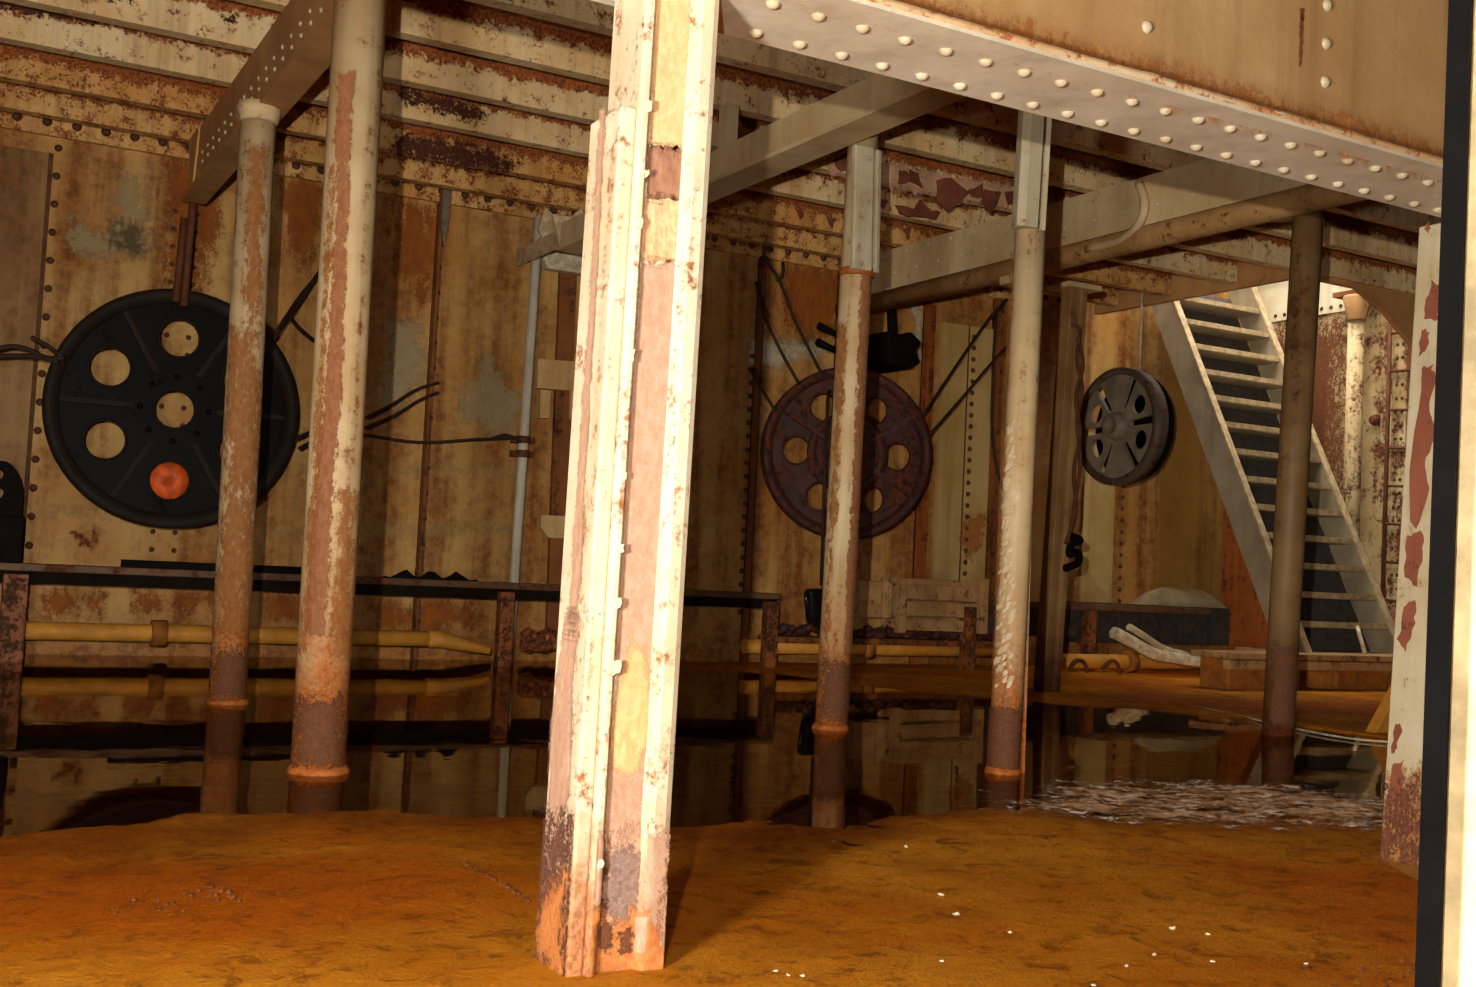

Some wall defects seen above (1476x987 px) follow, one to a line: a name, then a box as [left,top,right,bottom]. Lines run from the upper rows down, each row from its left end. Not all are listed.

rust [0,1,100,26]
rust [389,86,524,175]
peeling [828,152,847,178]
peeling [881,161,1014,239]
rust [971,14,1442,157]
rust [129,70,359,701]
rust [589,0,691,978]
rust [781,263,872,726]
rust [1312,313,1348,495]
peeling [1397,280,1439,652]
peeling [1385,724,1405,811]
rust [1380,761,1422,867]